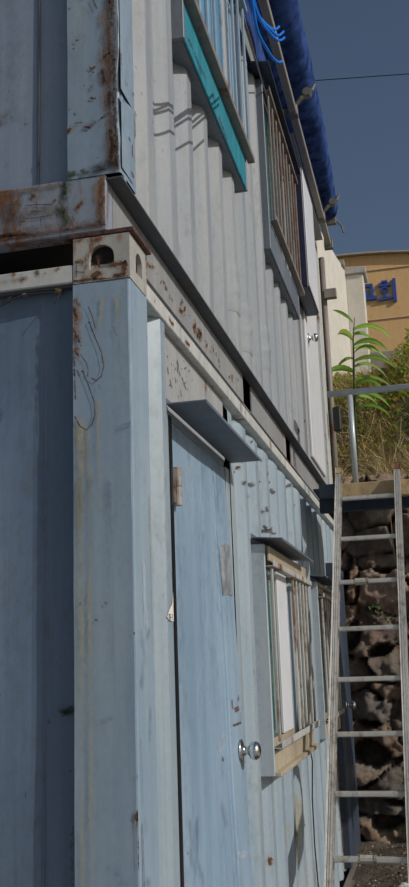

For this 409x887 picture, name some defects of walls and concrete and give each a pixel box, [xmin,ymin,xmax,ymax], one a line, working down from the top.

corrosion [100,0,120,170]
corrosion [0,174,128,282]